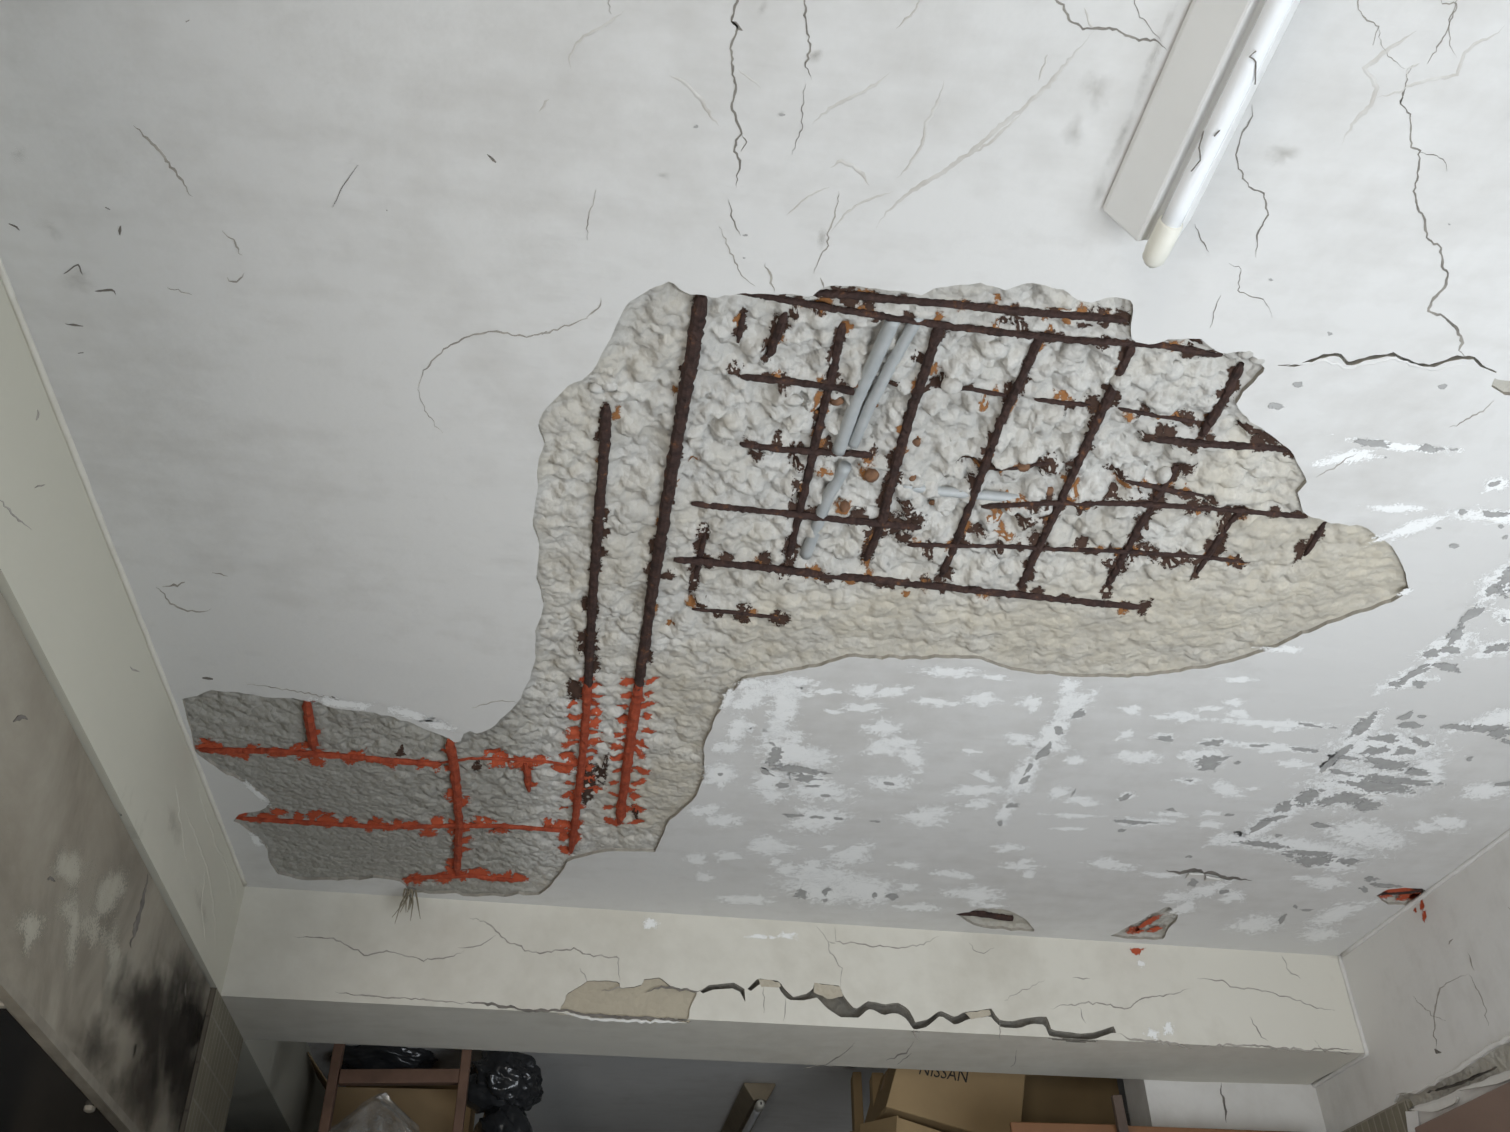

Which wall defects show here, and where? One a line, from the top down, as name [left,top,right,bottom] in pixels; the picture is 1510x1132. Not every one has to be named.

crack [719,0,775,291]
crack [792,0,812,153]
crack [814,196,839,288]
crack [1055,0,1166,49]
crack [1195,111,1272,327]
crack [1282,0,1510,427]
spalling [184,282,1510,955]
water stain [7,840,201,1127]
crack [701,928,1353,1070]
crack [1219,1083,1227,1120]